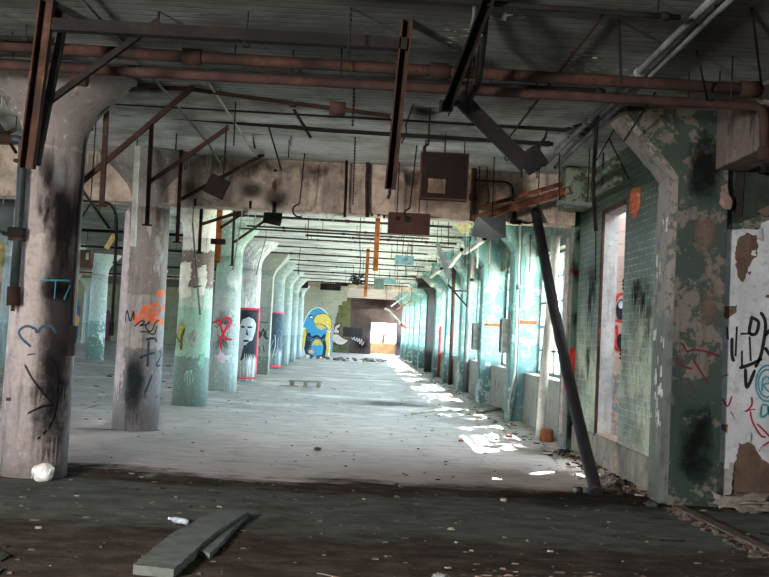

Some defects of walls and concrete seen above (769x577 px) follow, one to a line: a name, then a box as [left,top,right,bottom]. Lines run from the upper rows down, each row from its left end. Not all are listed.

peeling [719,184,733,210]
peeling [179,254,212,301]
peeling [487,262,502,314]
peeling [524,242,537,315]
peeling [735,228,769,298]
peeling [718,433,769,495]